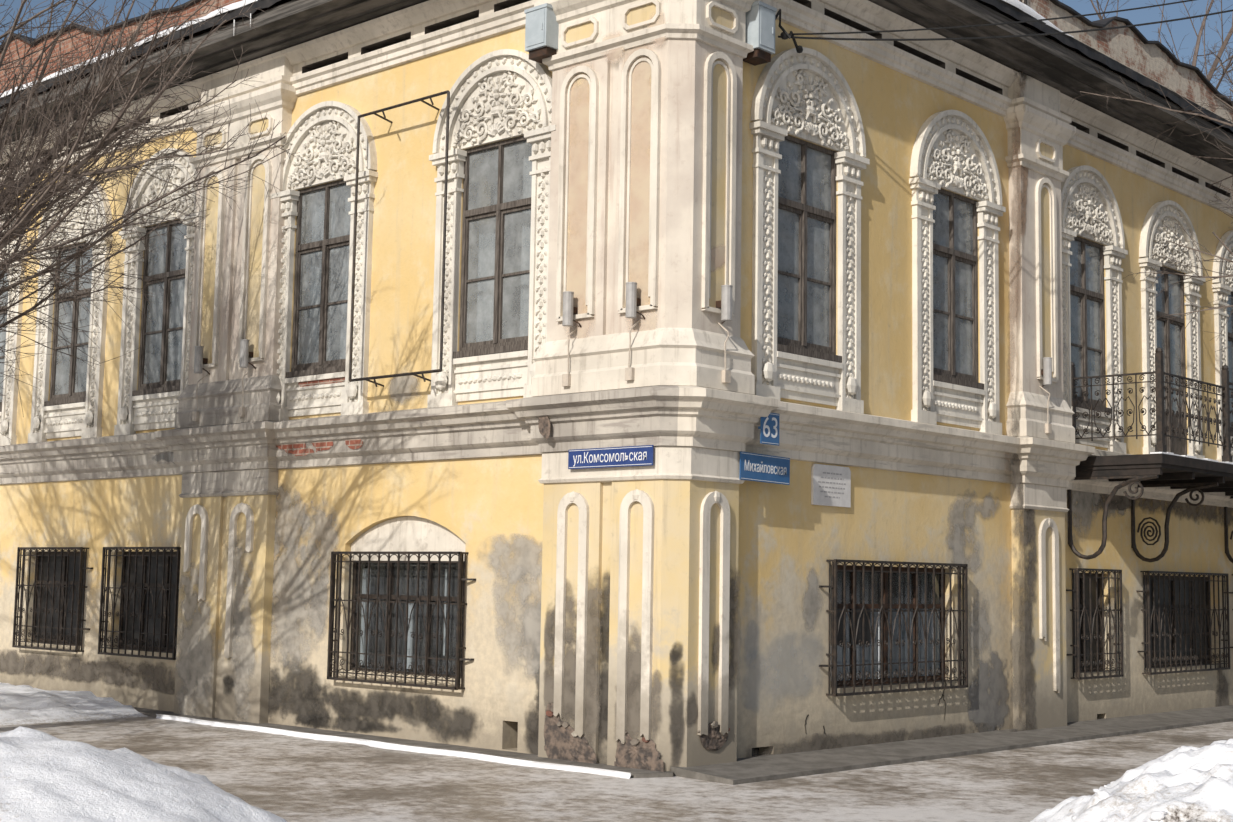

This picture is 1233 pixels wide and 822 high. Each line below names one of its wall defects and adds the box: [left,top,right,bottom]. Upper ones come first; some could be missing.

flaking render [276,438,363,456]
leakage [1012,405,1021,437]
leakage [0,568,213,715]
leakage [231,547,255,704]
leakage [268,661,475,740]
spalling [544,703,597,764]
leakage [491,536,698,771]
spalling [614,730,664,772]
leakage [713,576,741,687]
leakage [1010,455,1037,732]